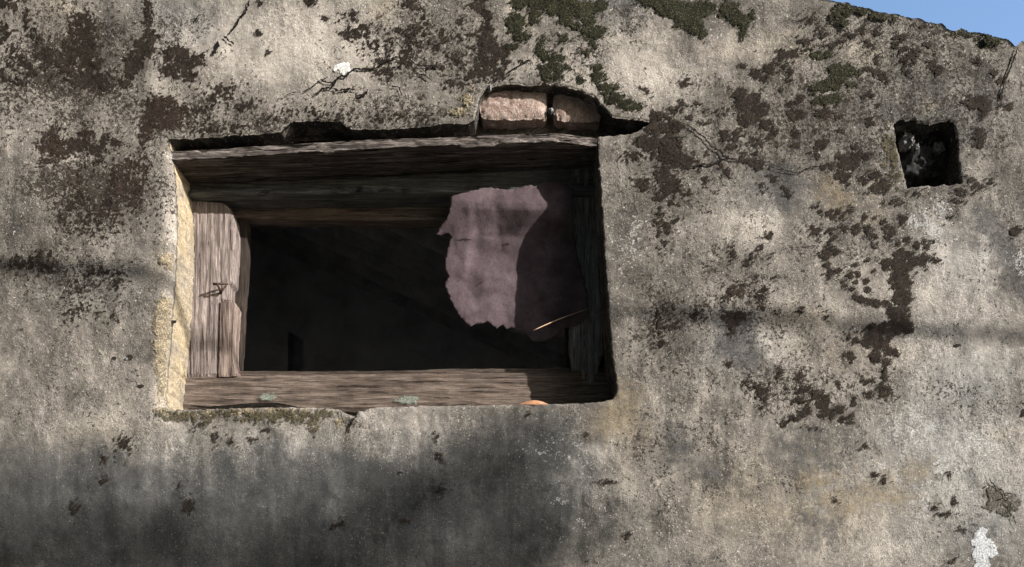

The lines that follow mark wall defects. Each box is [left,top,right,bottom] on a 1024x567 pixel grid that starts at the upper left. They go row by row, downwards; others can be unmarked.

crack [212,0,250,54]
crack [286,56,442,96]
crack [1000,47,1018,102]
spalling [445,84,622,138]
crack [670,124,737,167]
crack [765,165,822,173]